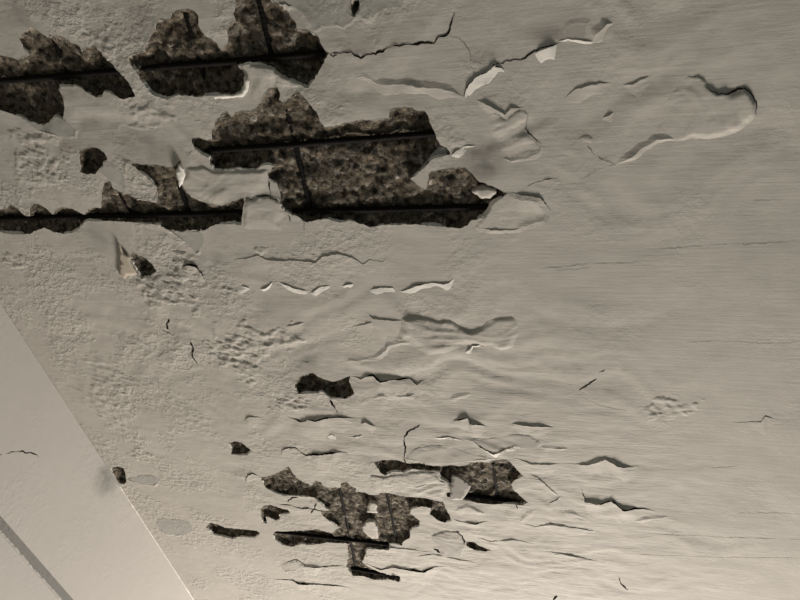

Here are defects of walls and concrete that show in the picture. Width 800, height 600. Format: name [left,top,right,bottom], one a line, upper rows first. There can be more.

crack [329,12,563,95]
peeling [535,18,613,63]
spalling [0,27,135,140]
spalling [128,0,561,234]
spalling [79,148,107,174]
spalling [0,159,244,286]
peeling [213,252,393,296]
peeling [370,279,454,295]
peeling [295,373,430,403]
crack [403,425,420,463]
spalling [244,415,670,597]
spalling [206,523,260,539]